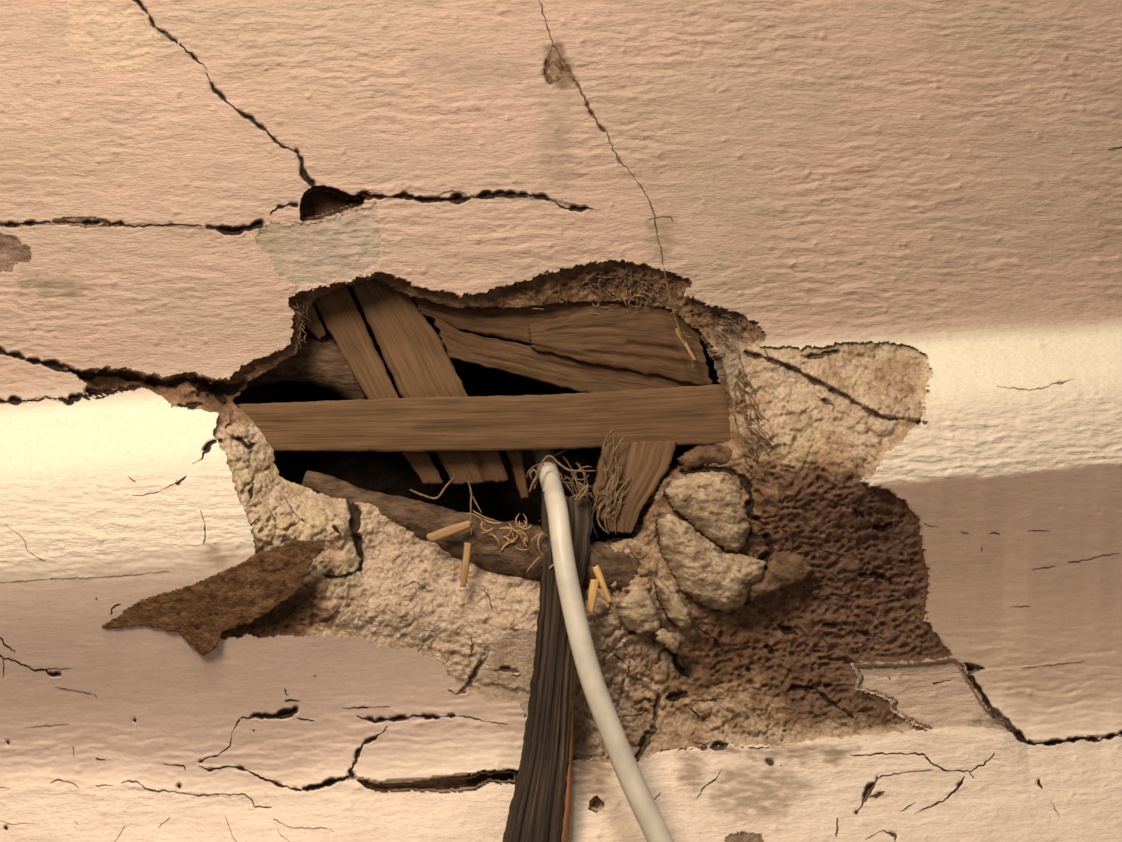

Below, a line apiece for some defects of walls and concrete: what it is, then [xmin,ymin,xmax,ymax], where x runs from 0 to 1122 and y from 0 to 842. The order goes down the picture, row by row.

peeling [0,233,31,272]
crack [0,0,315,235]
peeling [253,185,402,398]
crack [356,190,593,211]
spalling [424,316,586,397]
crack [539,0,673,266]
crack [744,349,928,424]
spalling [67,365,542,718]
spalling [553,341,1005,765]
crack [680,466,913,717]
crack [0,636,521,842]
crack [835,676,1122,842]